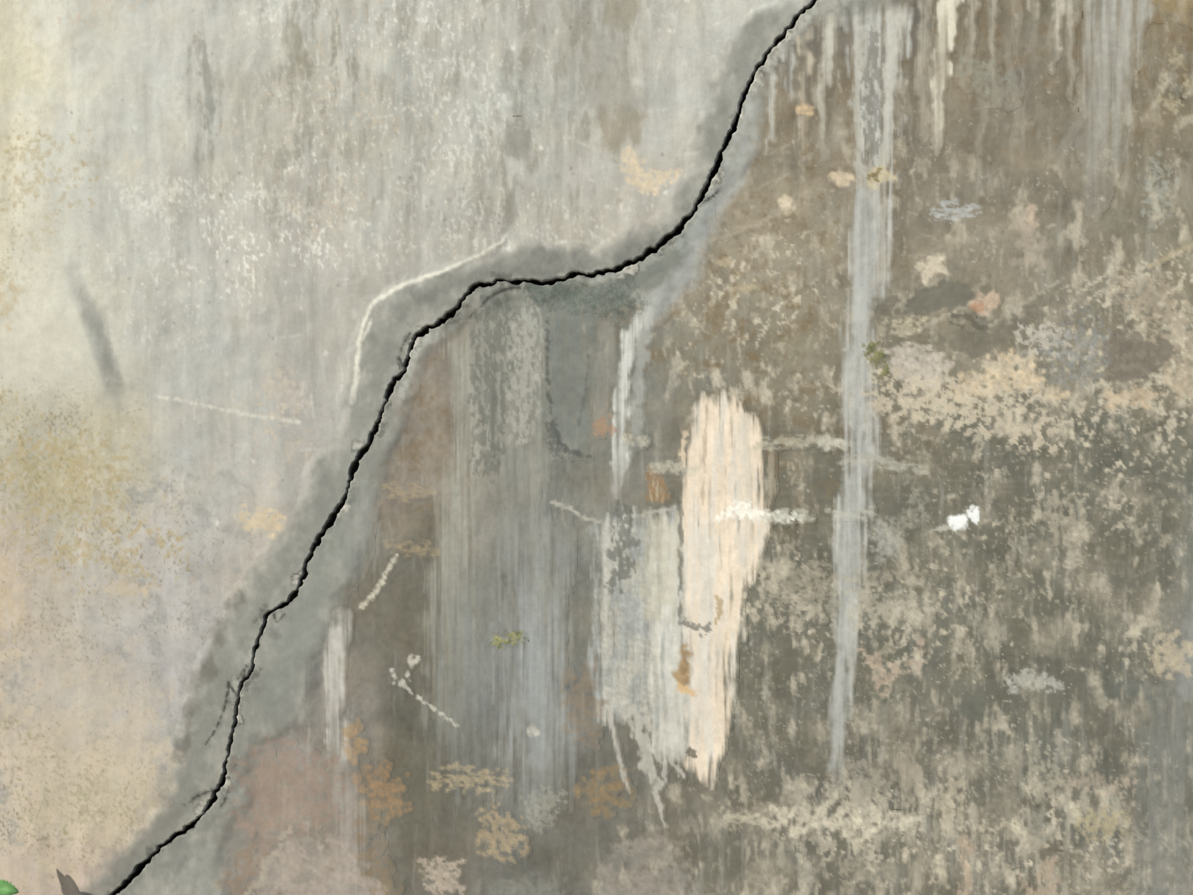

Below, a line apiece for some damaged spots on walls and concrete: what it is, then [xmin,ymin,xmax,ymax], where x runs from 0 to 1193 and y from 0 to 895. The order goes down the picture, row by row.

water stain [1024,0,1193,223]
water stain [301,479,378,865]
crack [104,0,822,895]
water stain [418,291,662,830]
peeling [583,387,940,895]
water stain [762,0,1002,782]
water stain [1034,299,1114,401]
water stain [1158,447,1193,638]
peeling [256,819,377,895]
peeling [415,758,570,895]
water stain [1127,676,1193,895]